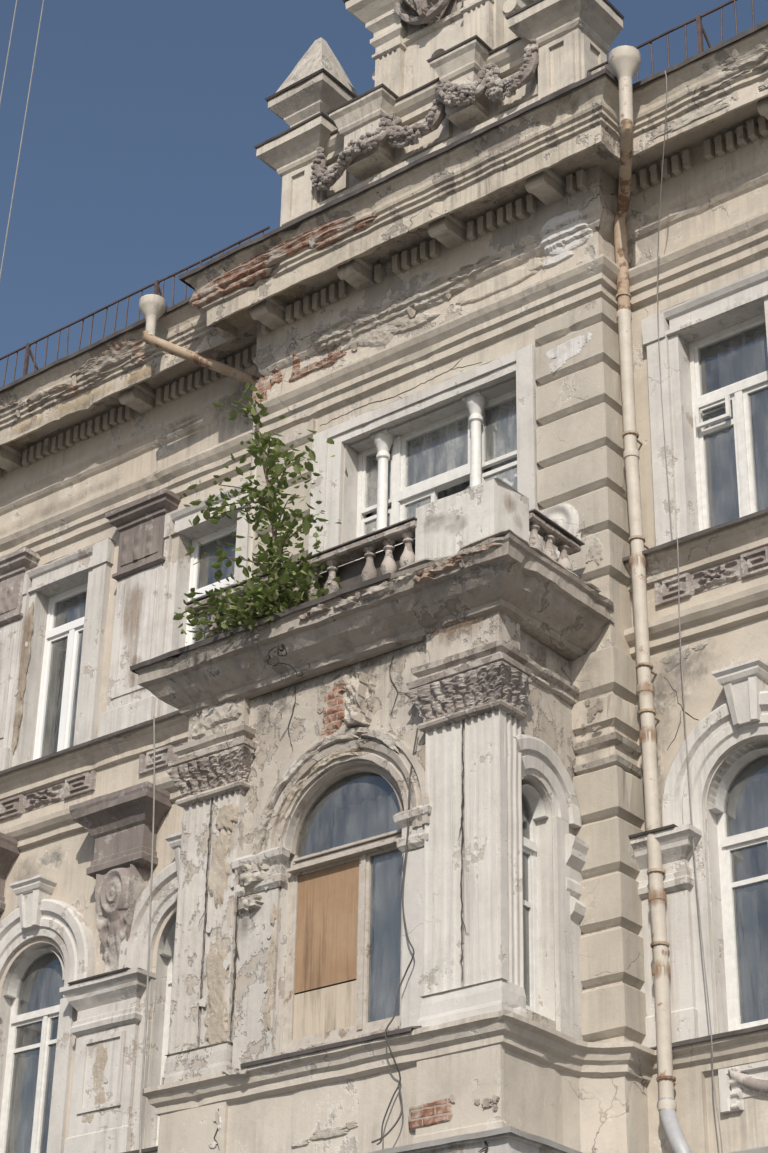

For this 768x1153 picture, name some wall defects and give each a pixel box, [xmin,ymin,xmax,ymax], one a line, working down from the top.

flaking render [251,256,503,405]
peeling [545,332,593,373]
crack [389,650,402,713]
flaking render [207,680,403,1031]
crack [458,721,466,980]
peeling [198,947,231,1047]
flaking render [408,1094,455,1131]